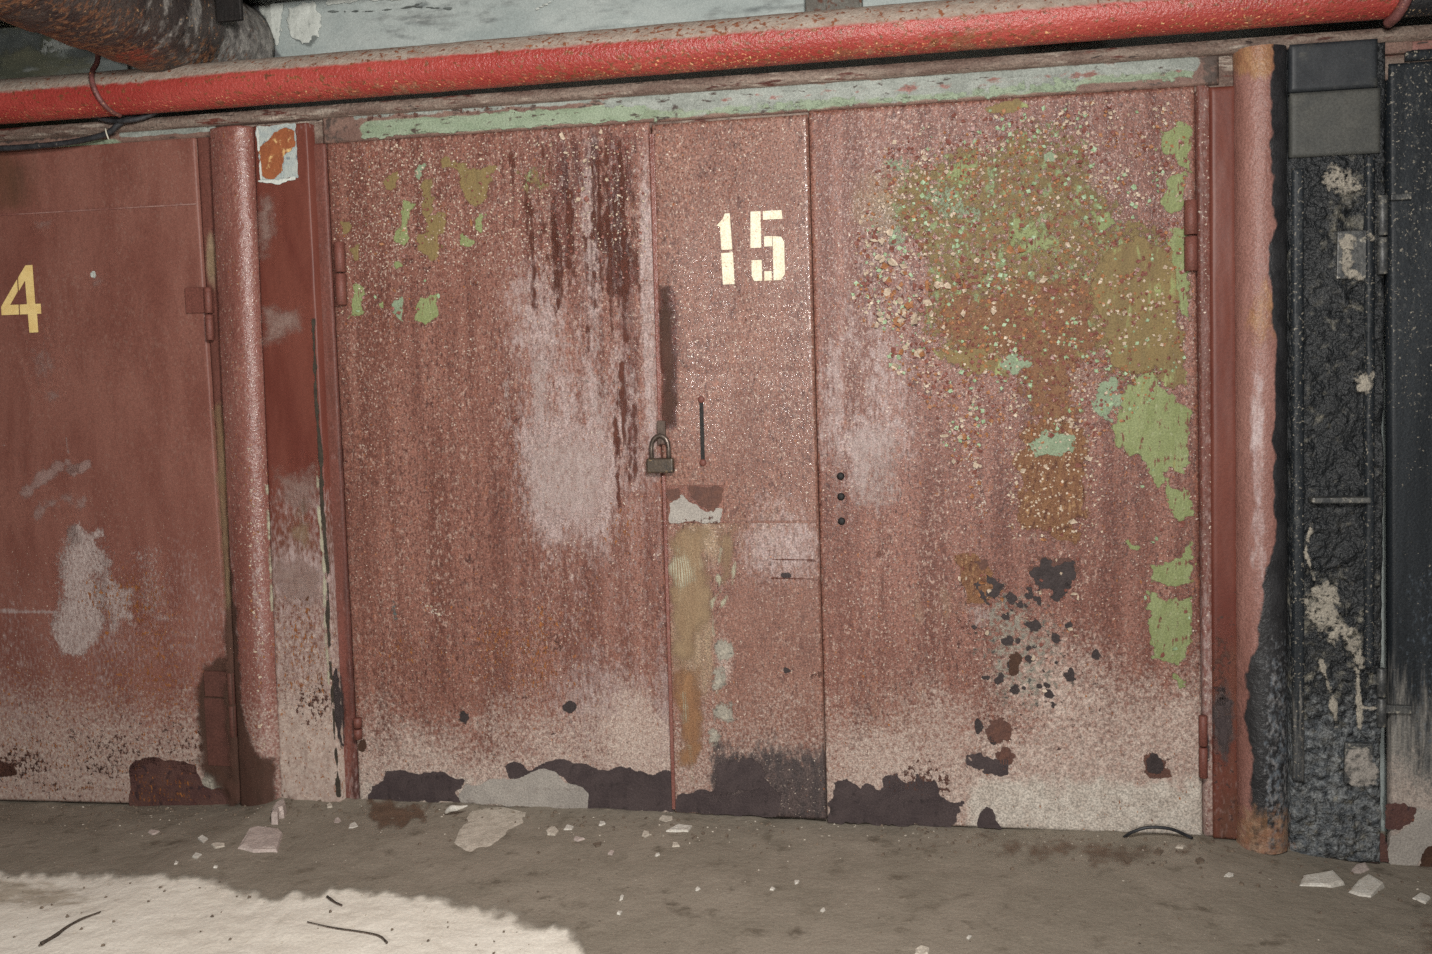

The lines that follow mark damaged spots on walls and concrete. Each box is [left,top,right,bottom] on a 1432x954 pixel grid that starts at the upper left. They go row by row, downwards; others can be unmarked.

peeling [707,97,855,115]
spalling [1322,162,1365,195]
peeling [332,105,657,351]
spalling [1339,233,1375,280]
peeling [851,71,1197,689]
spalling [1354,371,1375,393]
peeling [666,485,725,529]
water stain [710,548,736,608]
water stain [51,525,179,709]
water stain [0,572,1432,954]
spalling [1345,747,1379,787]